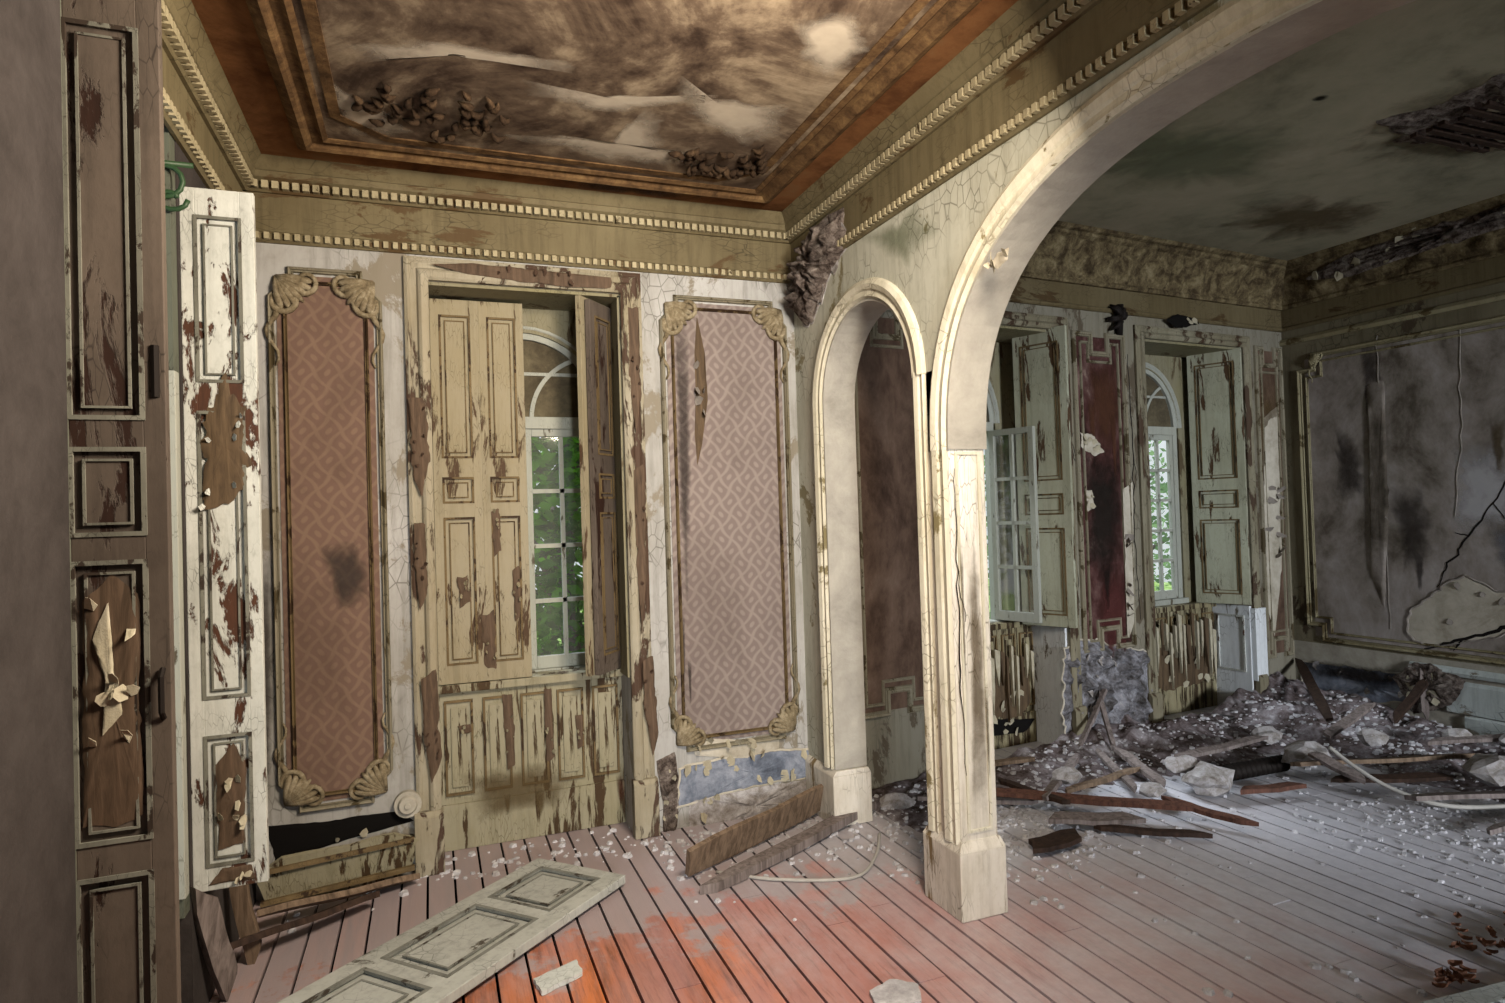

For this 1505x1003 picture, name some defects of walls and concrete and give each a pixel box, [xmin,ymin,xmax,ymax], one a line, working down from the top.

water stain [1253,205,1364,234]
peeling [198,372,252,511]
peeling [408,397,430,496]
crack [1437,336,1505,587]
water stain [330,555,362,599]
peeling [491,508,501,557]
water stain [1087,376,1126,658]
peeling [502,694,515,770]
spalling [643,656,809,832]
peeling [991,643,1035,736]
peeling [1301,574,1505,714]
spalling [268,812,413,860]